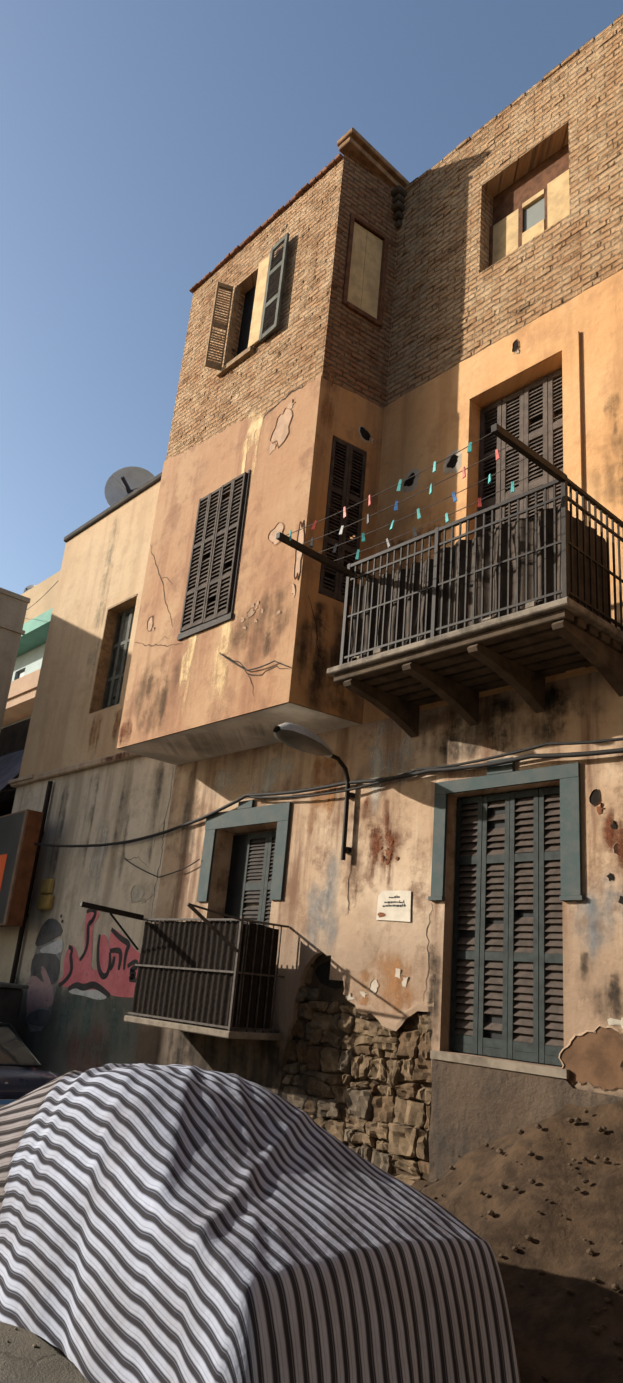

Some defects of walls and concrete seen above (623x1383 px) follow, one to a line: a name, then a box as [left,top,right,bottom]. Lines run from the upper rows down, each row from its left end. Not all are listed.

peeling [270,399,295,454]
leakage [180,634,197,684]
leakage [214,620,231,692]
crack [225,656,288,696]
rust [362,799,398,882]
rust [603,813,623,858]
flaking render [272,959,435,1186]
flaking render [556,1018,623,1092]